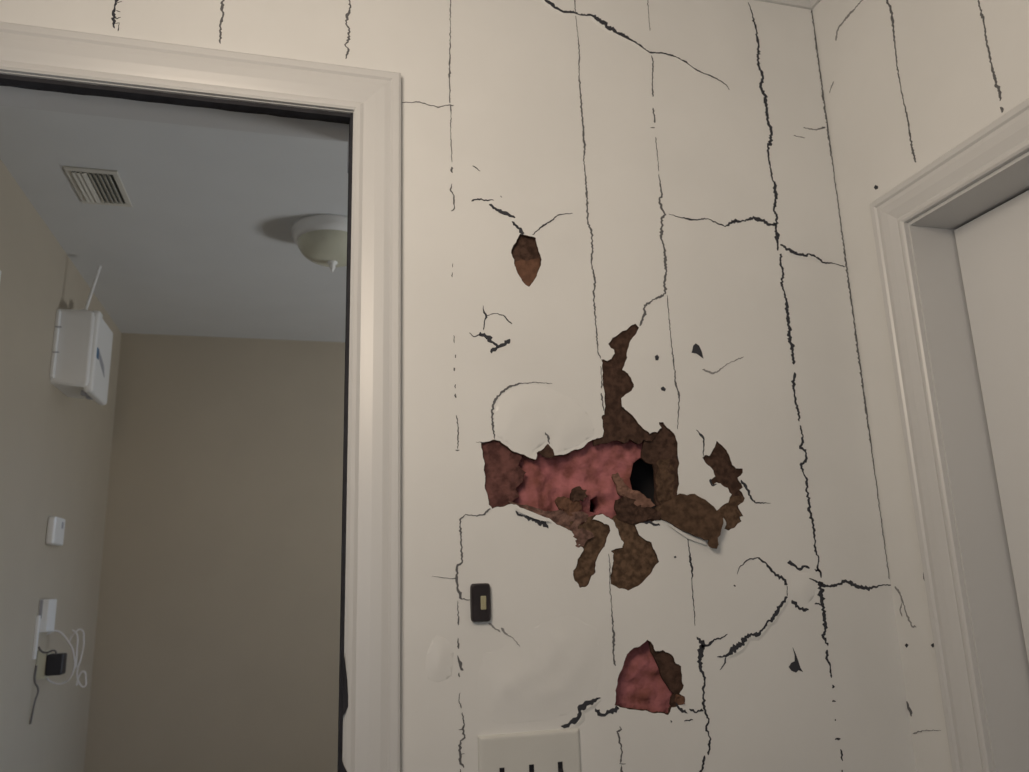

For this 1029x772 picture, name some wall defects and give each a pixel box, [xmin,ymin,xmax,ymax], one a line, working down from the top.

crack [111,0,122,31]
crack [218,0,226,44]
crack [343,0,351,59]
crack [402,0,480,211]
crack [978,0,1004,112]
spalling [472,198,572,287]
crack [454,306,552,451]
crack [540,0,916,772]
spalling [481,324,766,590]
crack [516,511,548,528]
crack [434,508,490,772]
spalling [615,640,685,715]